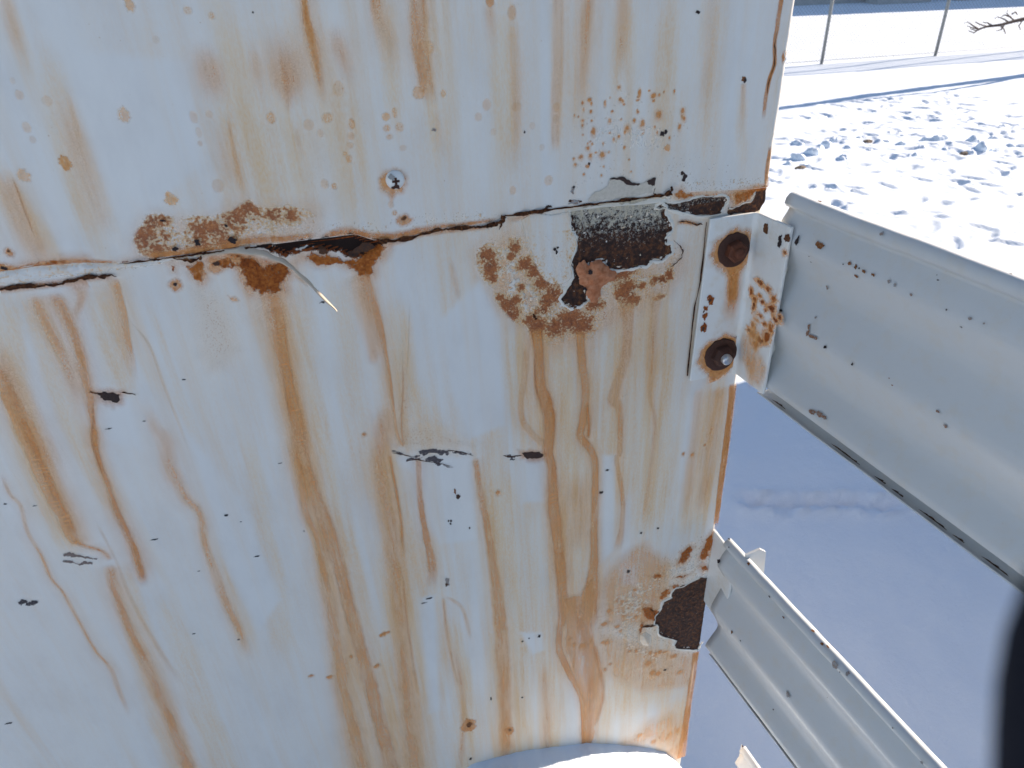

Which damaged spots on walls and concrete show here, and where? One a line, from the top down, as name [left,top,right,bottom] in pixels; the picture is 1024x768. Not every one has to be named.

rust [573,89,685,175]
rust [0,249,127,272]
crack [0,186,673,291]
spalling [515,177,767,311]
rust [149,215,490,444]
rust [0,374,100,551]
rust [55,300,144,577]
peeling [90,391,135,403]
rust [532,229,782,758]
spalling [641,577,707,651]